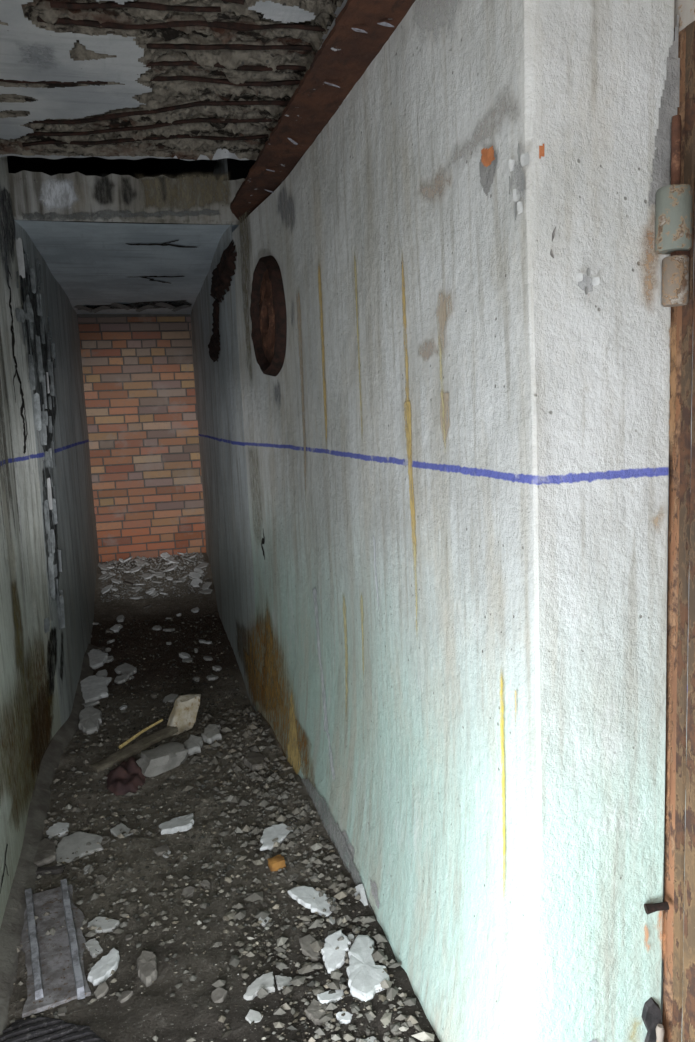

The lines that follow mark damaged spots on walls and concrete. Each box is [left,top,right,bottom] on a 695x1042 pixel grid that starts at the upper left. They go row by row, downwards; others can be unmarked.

spalling [0,0,344,160]
corrosion [644,222,657,300]
damp [0,331,25,605]
peeling [1,188,220,719]